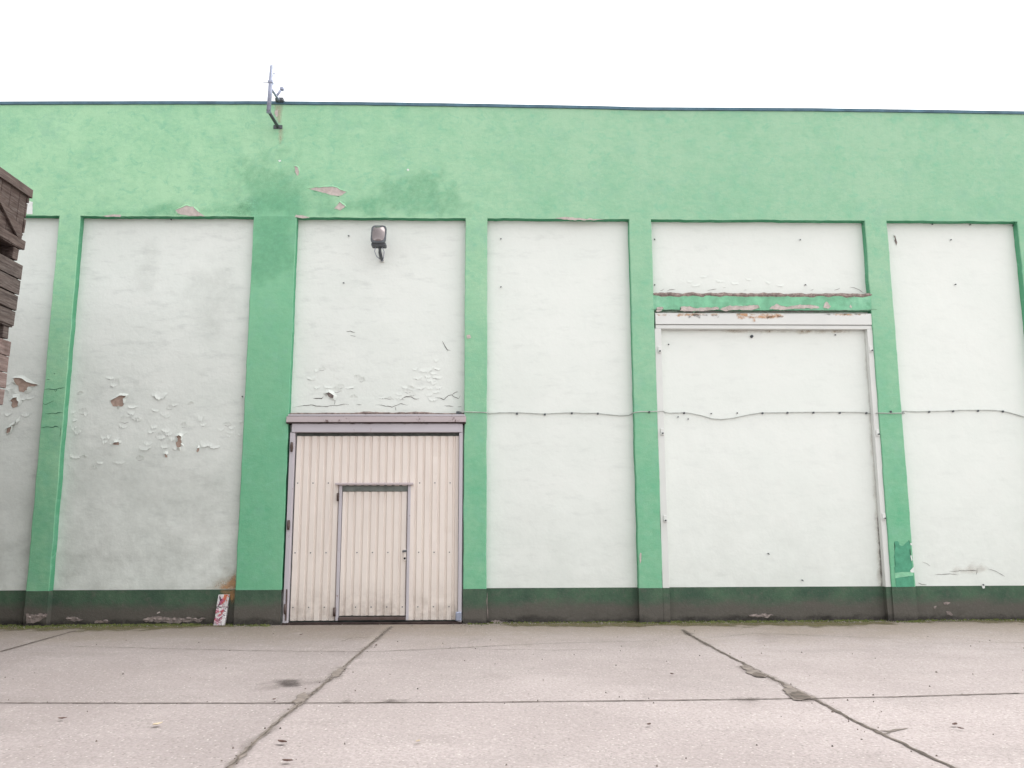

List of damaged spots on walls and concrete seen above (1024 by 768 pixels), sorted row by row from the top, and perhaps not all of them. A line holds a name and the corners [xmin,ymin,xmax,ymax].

peeling [175,204,204,216]
peeling [309,185,347,210]
spalling [653,292,872,313]
peeling [5,375,40,435]
peeling [109,393,129,409]
spalling [290,389,464,414]
peeling [163,433,184,457]
peeling [894,540,914,587]